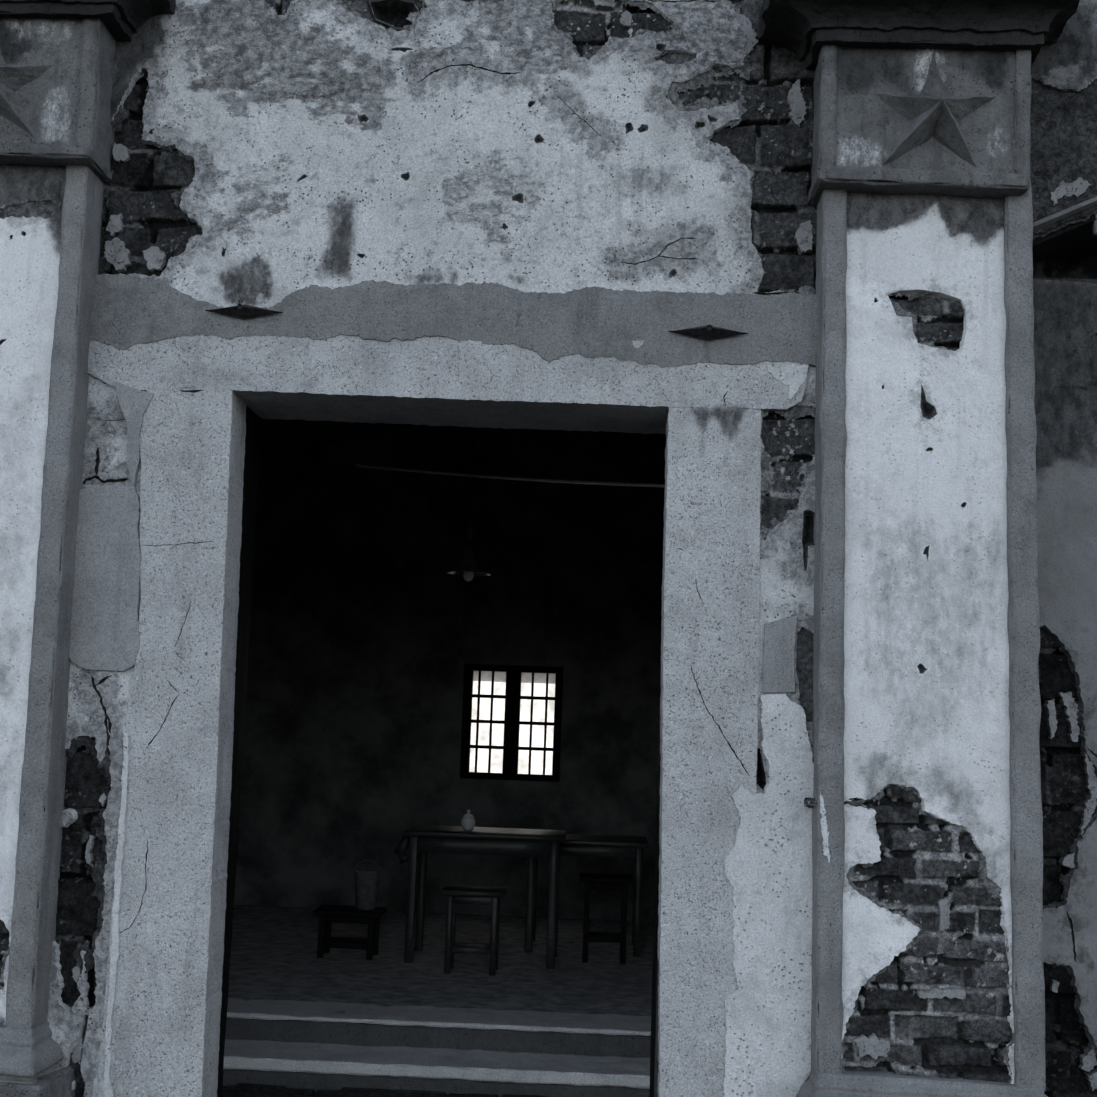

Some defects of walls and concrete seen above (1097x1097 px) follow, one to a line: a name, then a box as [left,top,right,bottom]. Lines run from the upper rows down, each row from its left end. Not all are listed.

peeling [98,63,203,277]
crack [418,64,520,83]
peeling [551,0,817,294]
spalling [874,289,967,351]
peeling [760,405,816,571]
crack [91,675,112,750]
crack [691,666,750,776]
peeling [1038,625,1097,909]
peeling [0,920,10,990]
peeling [53,735,111,1097]
peeling [842,784,1014,1084]
peeling [1043,962,1097,1097]